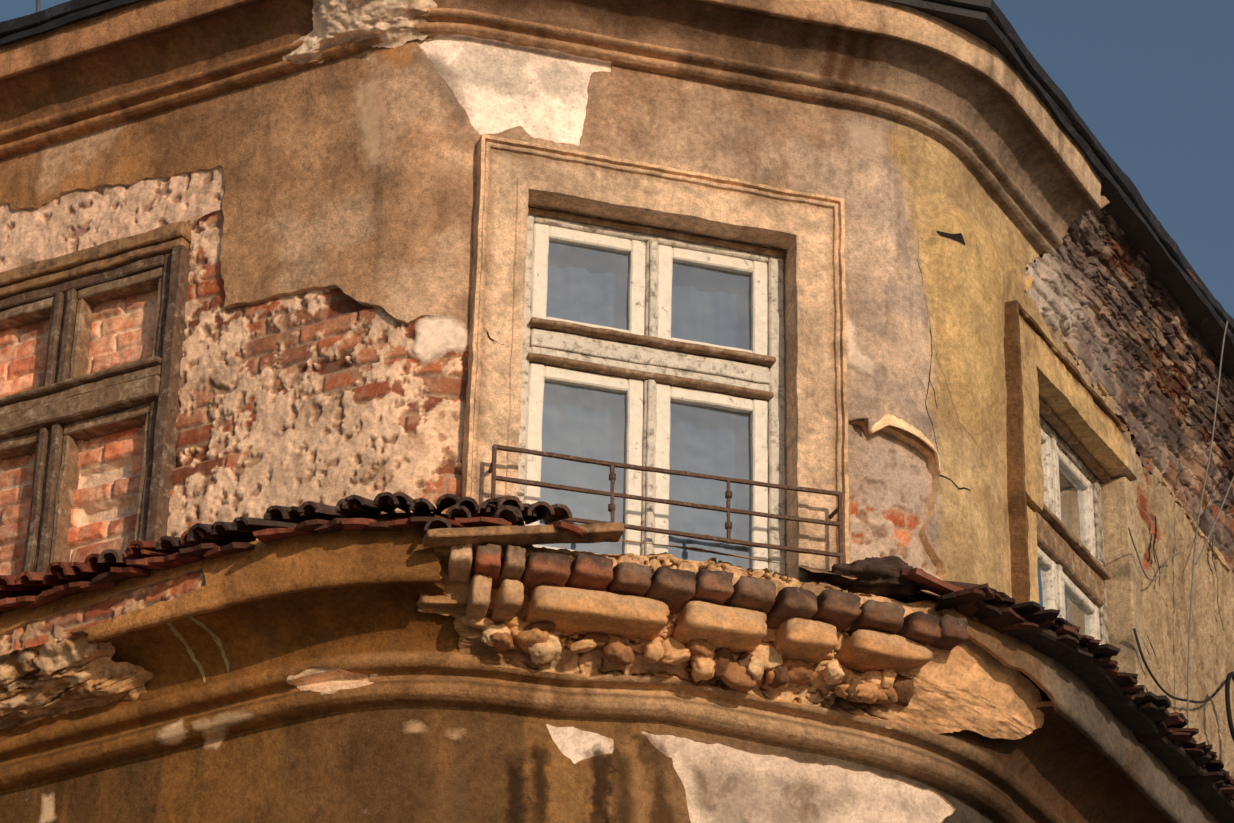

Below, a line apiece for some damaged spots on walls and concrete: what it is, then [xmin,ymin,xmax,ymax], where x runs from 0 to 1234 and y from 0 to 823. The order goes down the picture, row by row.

flaking render [418,35,612,145]
spalling [0,165,470,537]
crack [925,326,971,491]
spalling [848,414,948,581]
spalling [1025,275,1234,779]
spalling [0,568,206,656]
flaking render [435,543,1057,711]
water stain [508,746,550,823]
flaking render [546,723,614,764]
water stain [579,734,674,823]
flaking render [641,730,956,823]